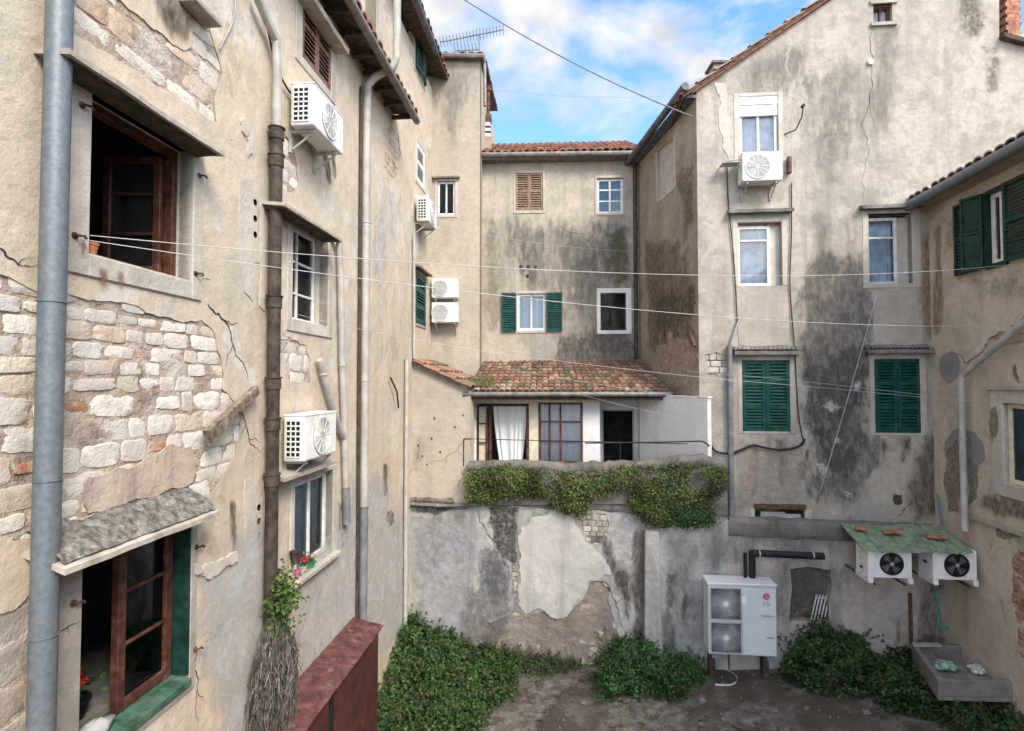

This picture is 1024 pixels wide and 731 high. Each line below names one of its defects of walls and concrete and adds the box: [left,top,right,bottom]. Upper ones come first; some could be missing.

flaking render [74,0,221,122]
flaking render [283,134,298,193]
crack [0,248,37,267]
flaking render [0,275,37,541]
flaking render [62,294,240,520]
crack [208,304,248,377]
leakage [558,334,634,361]
leakage [801,255,878,500]
spalling [943,407,998,512]
peeling [194,479,258,579]
leakage [489,506,517,562]
flaking render [517,510,611,619]